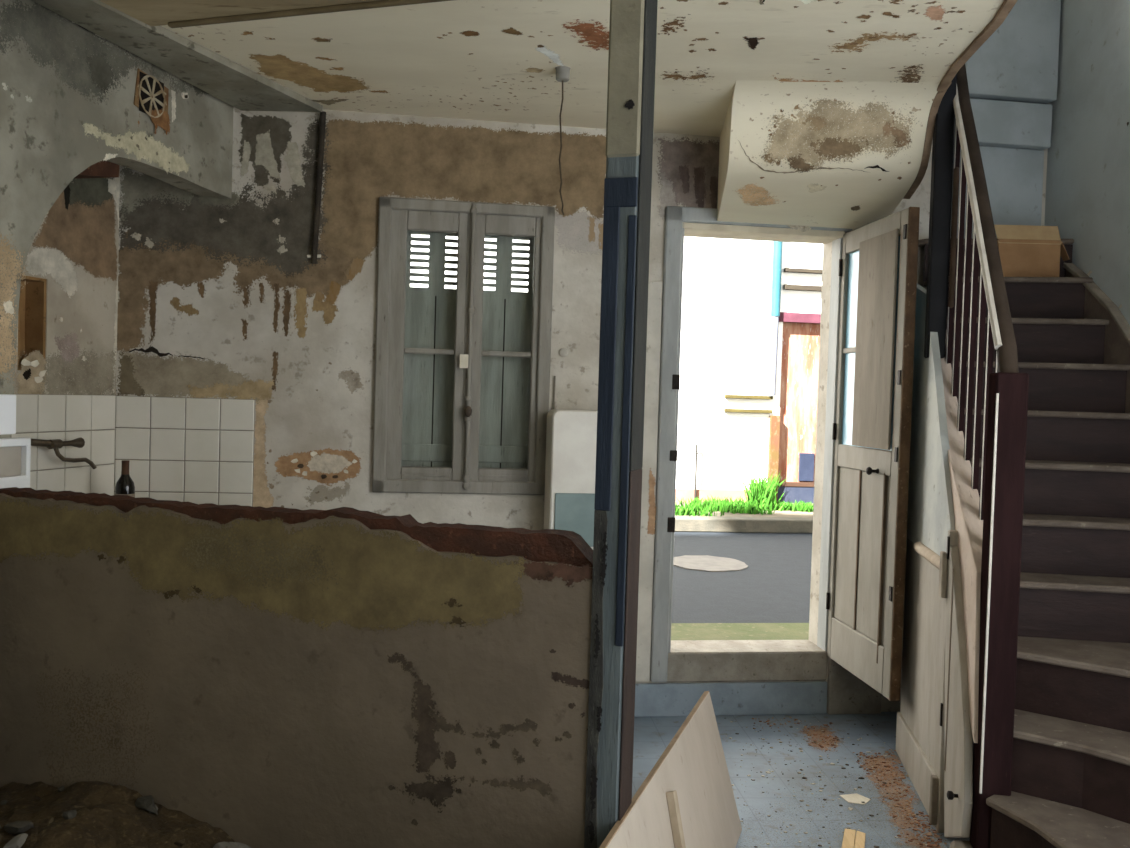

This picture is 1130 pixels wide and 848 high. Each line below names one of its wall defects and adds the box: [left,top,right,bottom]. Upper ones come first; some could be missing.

peeling [657,0,719,53]
spalling [743,36,765,49]
peeling [812,0,966,74]
peeling [661,67,716,91]
peeling [82,123,190,176]
peeling [238,113,305,187]
crack [740,144,890,174]
leakage [755,97,917,173]
peeling [108,176,120,228]
spalling [16,350,47,394]
spalling [253,389,362,508]